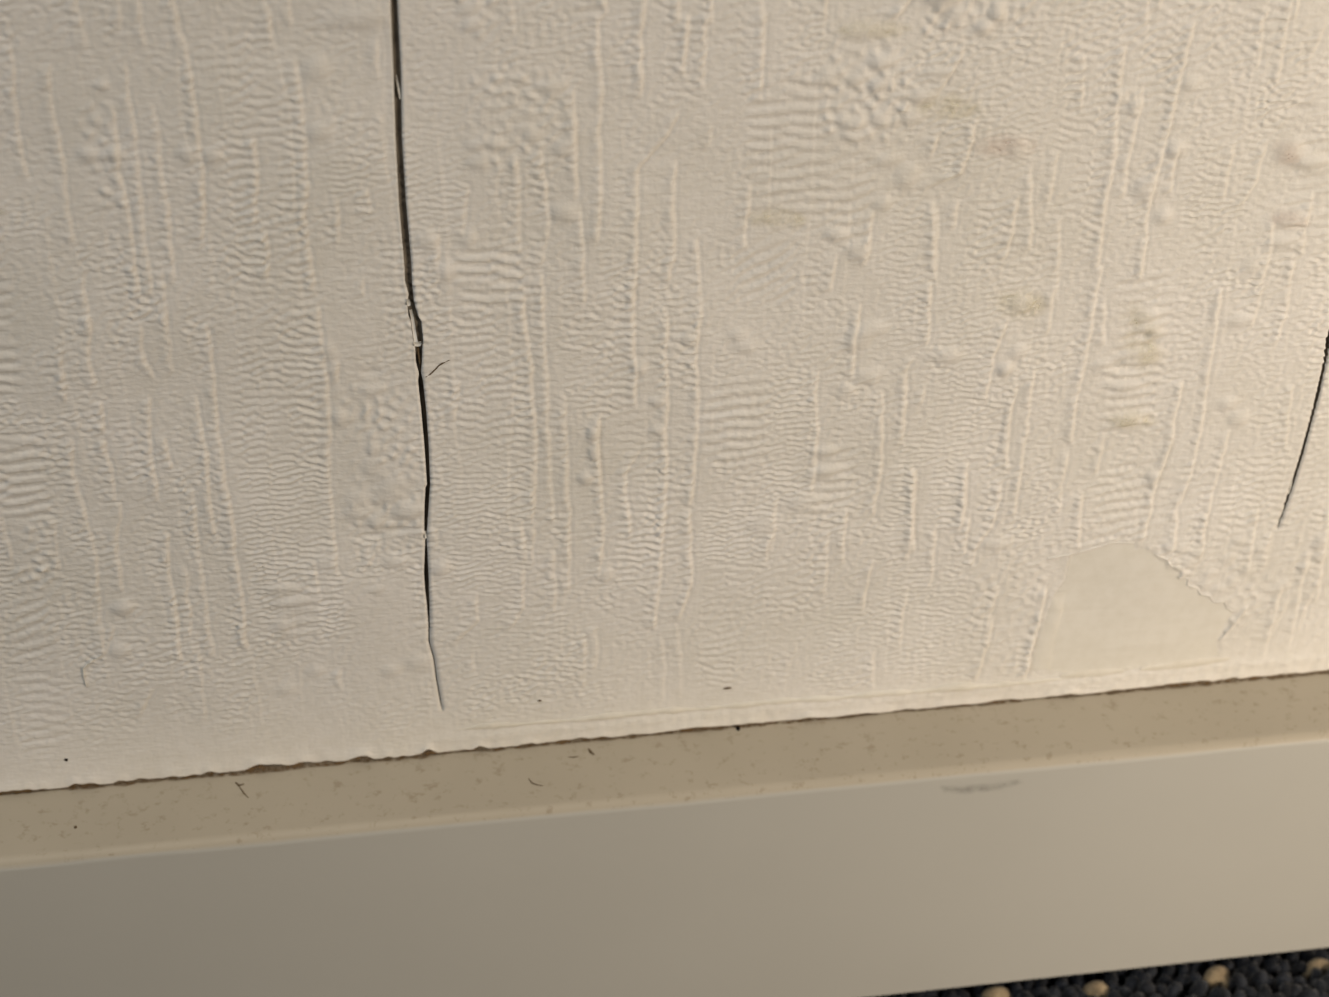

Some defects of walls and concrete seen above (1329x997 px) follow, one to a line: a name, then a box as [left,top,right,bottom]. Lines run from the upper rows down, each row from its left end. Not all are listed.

crack [391,0,449,708]